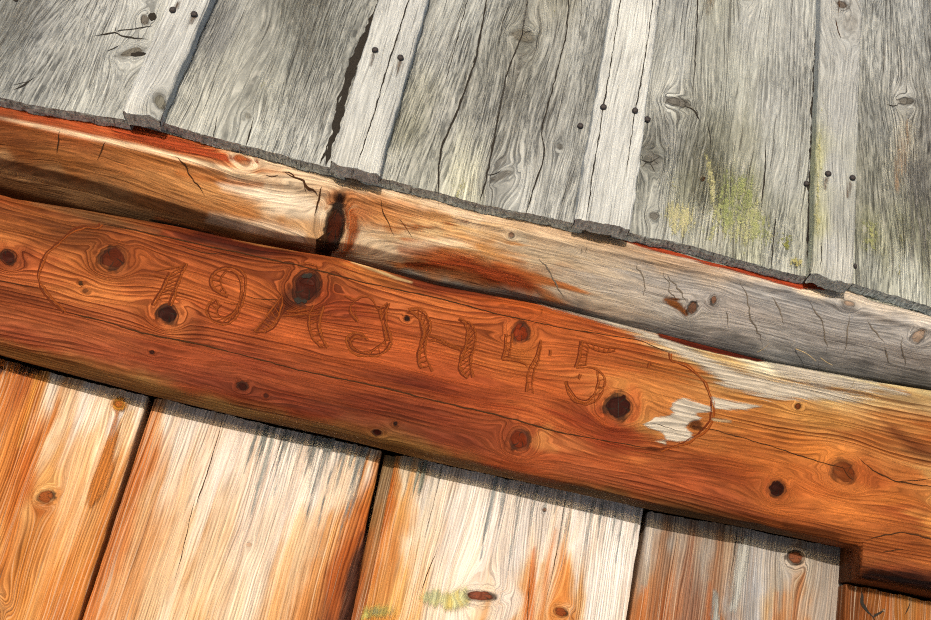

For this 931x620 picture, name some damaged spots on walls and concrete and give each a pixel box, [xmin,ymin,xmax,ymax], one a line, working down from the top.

crack [438,0,529,200]
crack [526,0,582,213]
crack [706,428,930,486]